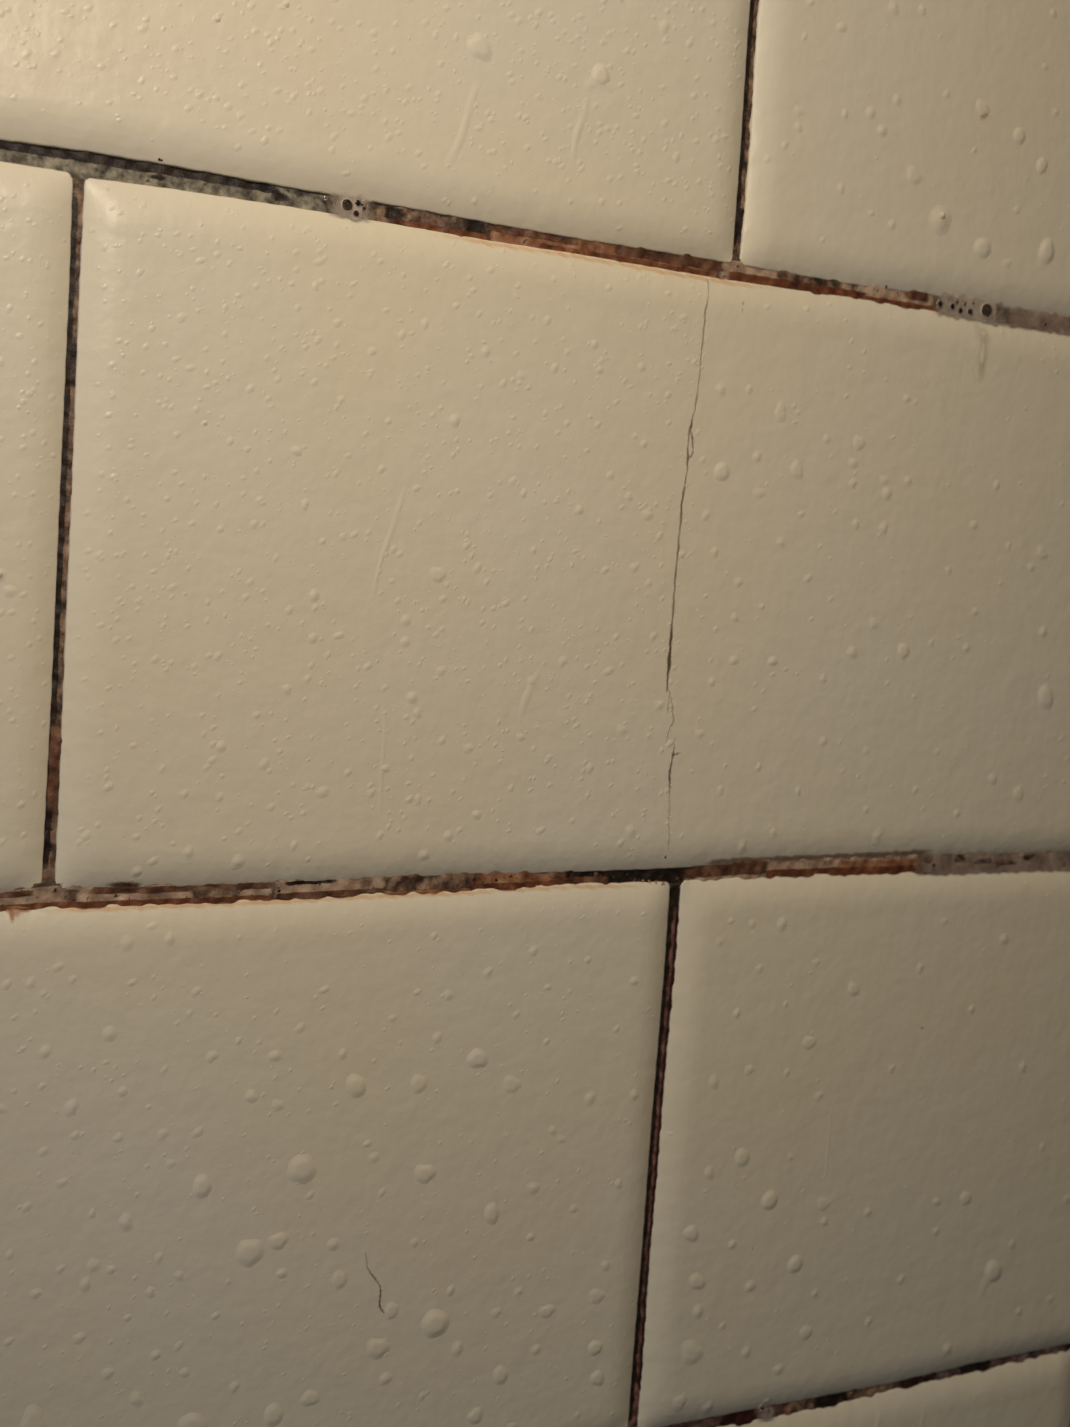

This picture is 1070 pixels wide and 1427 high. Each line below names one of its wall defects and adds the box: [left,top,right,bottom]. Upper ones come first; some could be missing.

crack [667,417,693,689]